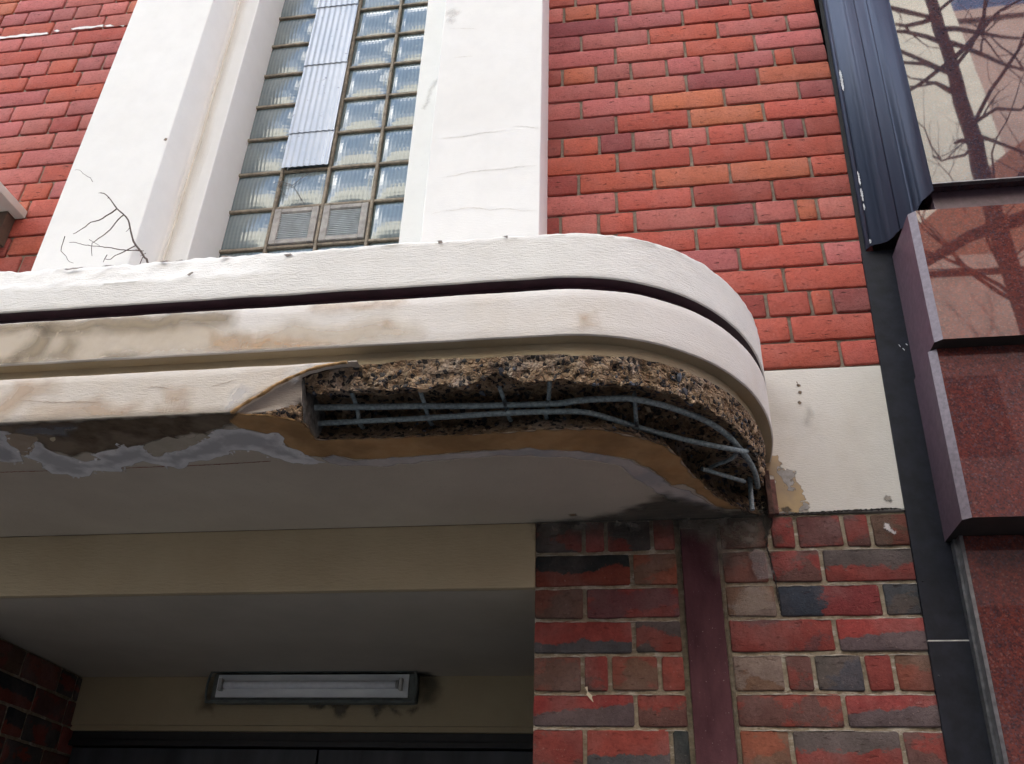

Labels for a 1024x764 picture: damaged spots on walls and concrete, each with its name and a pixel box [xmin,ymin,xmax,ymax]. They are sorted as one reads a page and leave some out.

spalling [0,354,810,514]